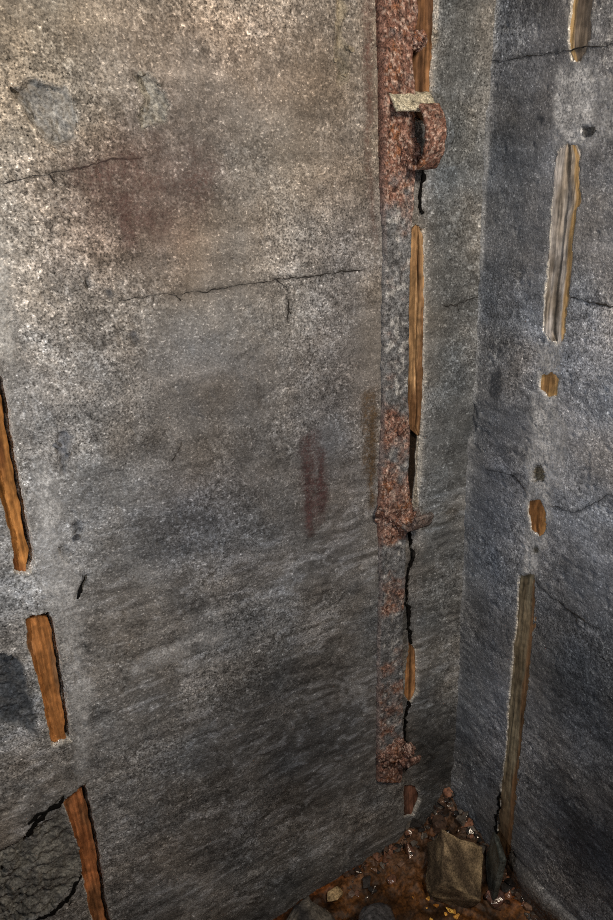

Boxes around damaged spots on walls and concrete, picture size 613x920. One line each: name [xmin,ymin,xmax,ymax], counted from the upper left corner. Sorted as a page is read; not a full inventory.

spalling [9,78,80,149]
crack [127,269,364,322]
crack [570,297,613,308]
crack [404,532,415,645]
crack [403,701,412,745]
crack [26,797,65,837]
crack [37,875,82,920]